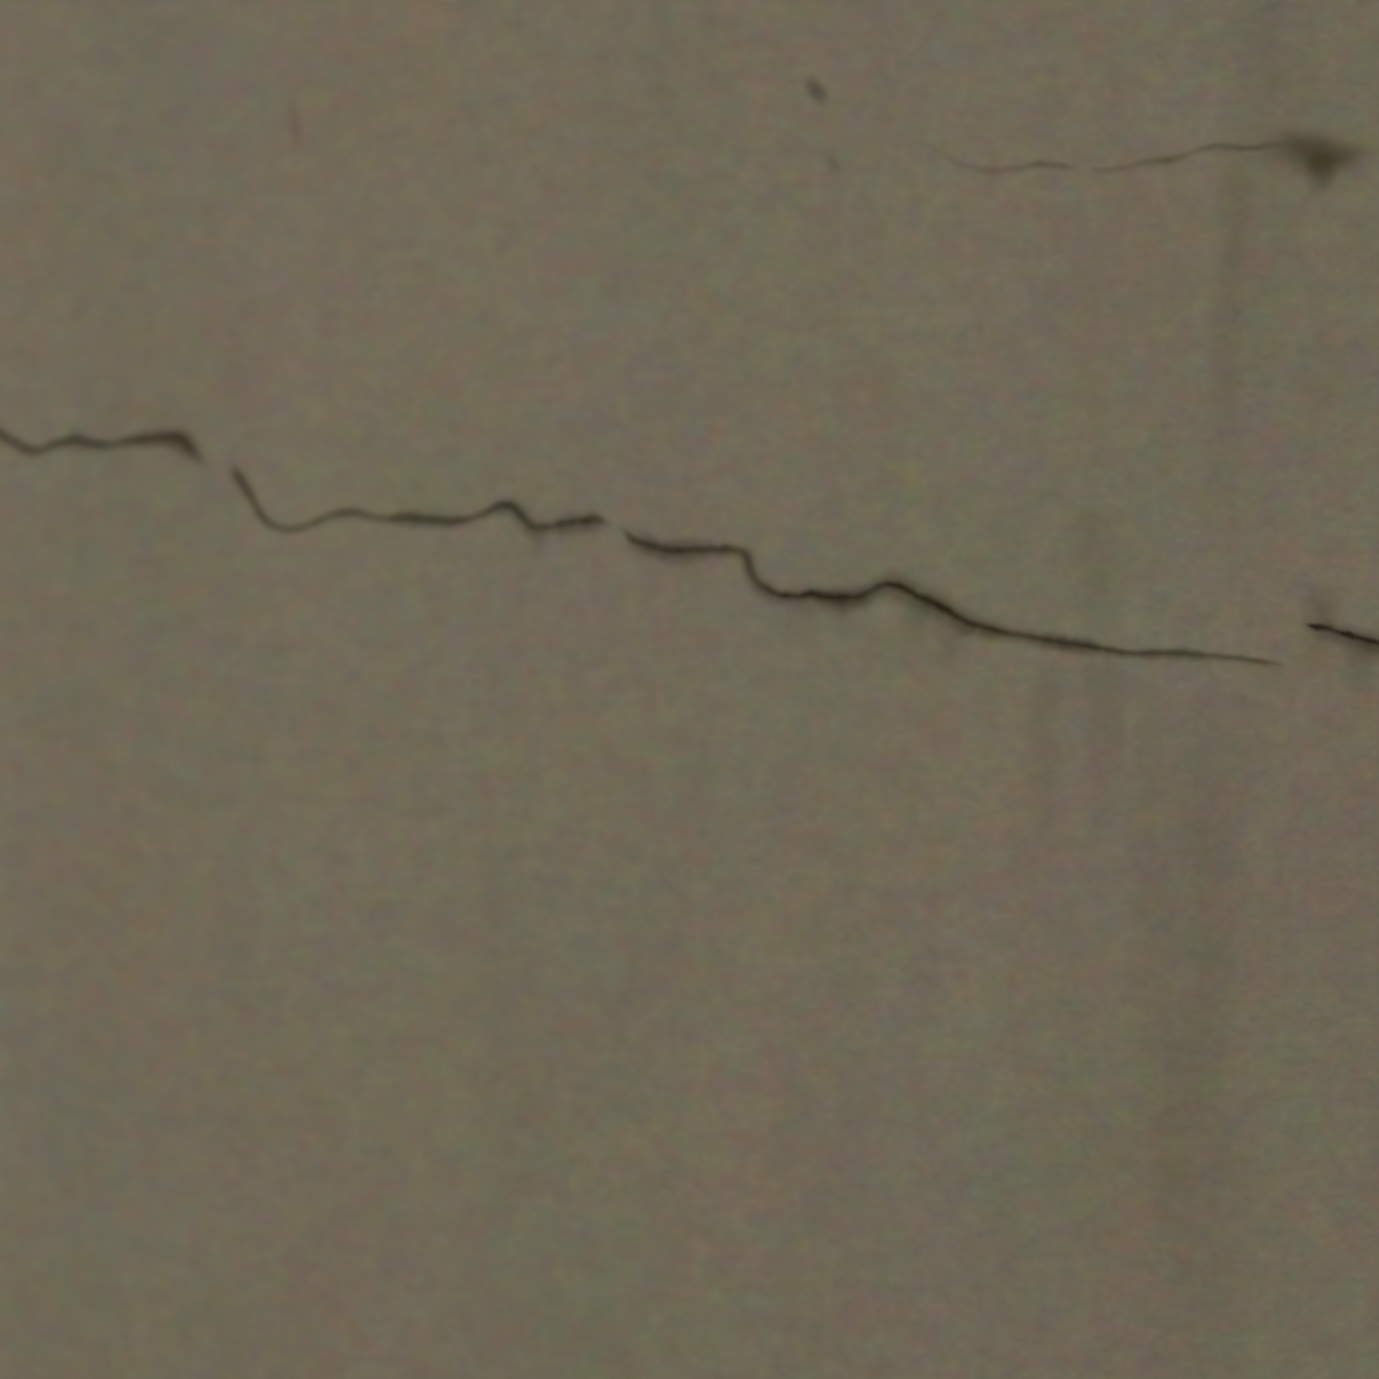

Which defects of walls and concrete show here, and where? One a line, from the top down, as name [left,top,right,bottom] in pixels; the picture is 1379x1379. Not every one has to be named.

crack [0,432,1289,666]
crack [1305,624,1379,646]